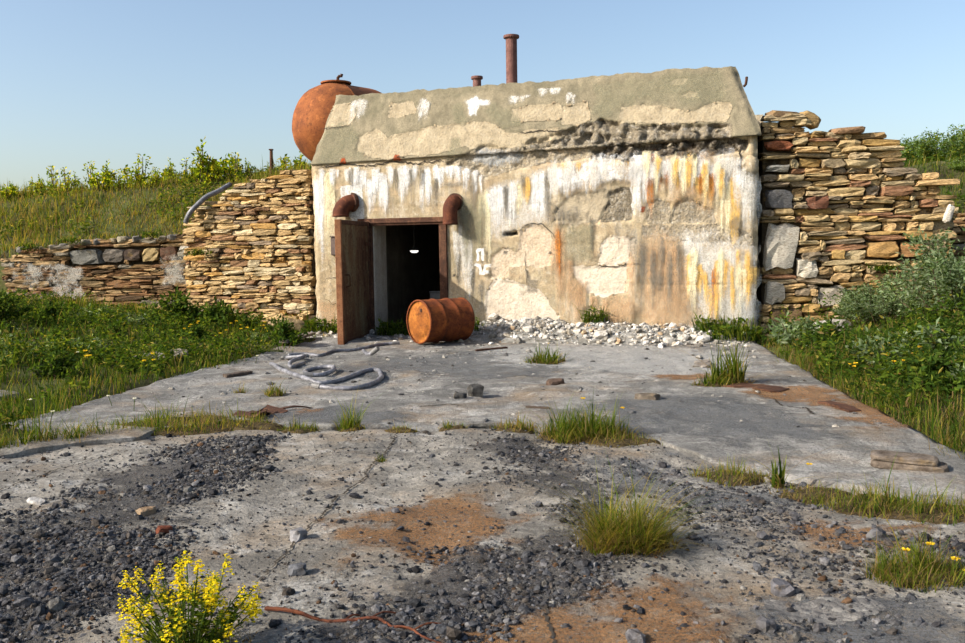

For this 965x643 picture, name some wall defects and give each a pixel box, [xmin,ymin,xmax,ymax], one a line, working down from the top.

peeling [357,100,748,178]
leakage [313,124,762,298]
peeling [484,187,754,321]
leakage [615,220,760,323]
crack [259,435,422,582]